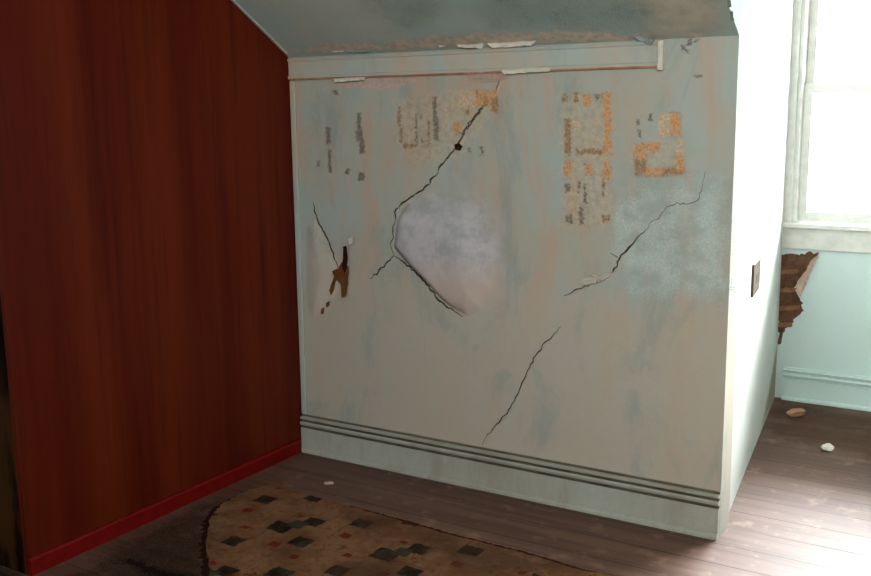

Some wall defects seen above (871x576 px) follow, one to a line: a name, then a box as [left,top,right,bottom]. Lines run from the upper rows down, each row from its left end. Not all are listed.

crack [371,81,501,317]
crack [564,172,706,296]
flaking render [778,251,819,344]
crack [483,328,563,446]